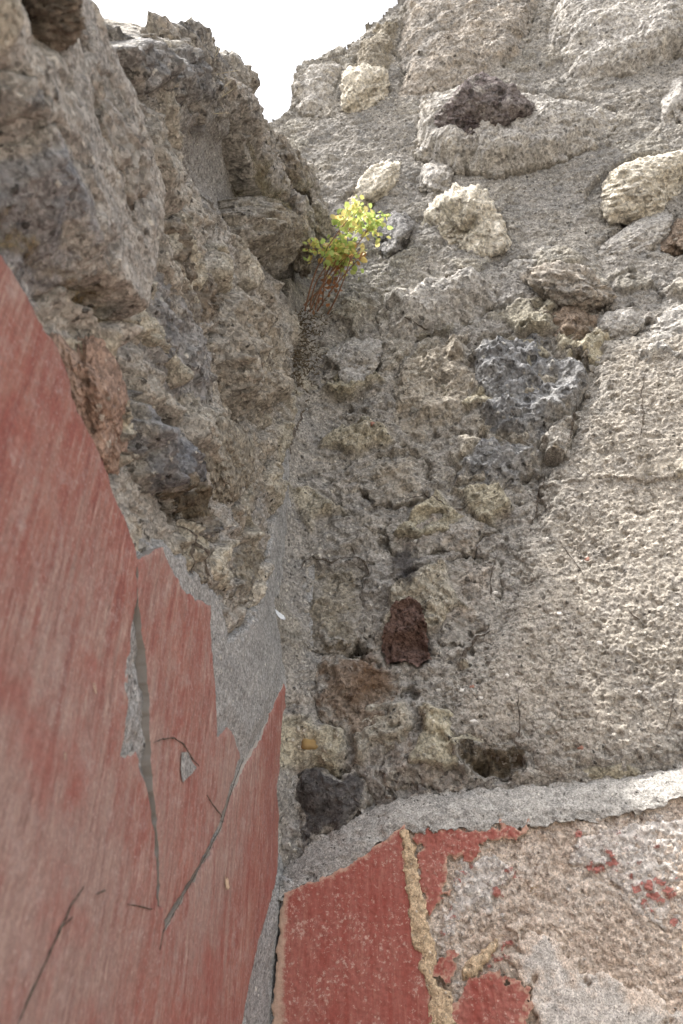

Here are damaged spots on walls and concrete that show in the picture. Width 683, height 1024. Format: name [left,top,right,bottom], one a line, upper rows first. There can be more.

crack [153,737,199,766]
spalling [181,752,197,782]
crack [17,886,106,1024]
crack [128,758,244,950]
spalling [432,854,520,985]
peeling [452,940,534,1024]
spalling [568,813,683,932]